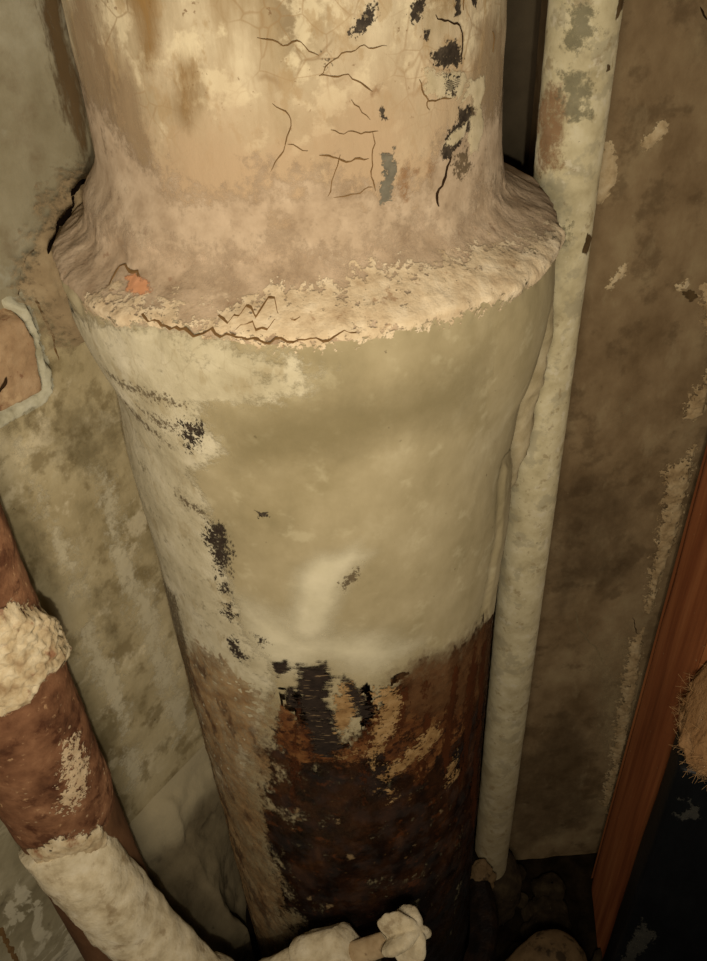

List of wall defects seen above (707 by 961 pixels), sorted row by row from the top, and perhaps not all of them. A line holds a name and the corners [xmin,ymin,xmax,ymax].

crack [259,38,384,198]
peeling [347,1,379,39]
peeling [379,147,399,206]
crack [419,80,452,108]
peeling [406,0,485,207]
crack [18,179,86,359]
spalling [682,282,707,336]
spalling [682,368,707,422]
peeling [68,213,566,796]
rust [178,613,494,961]